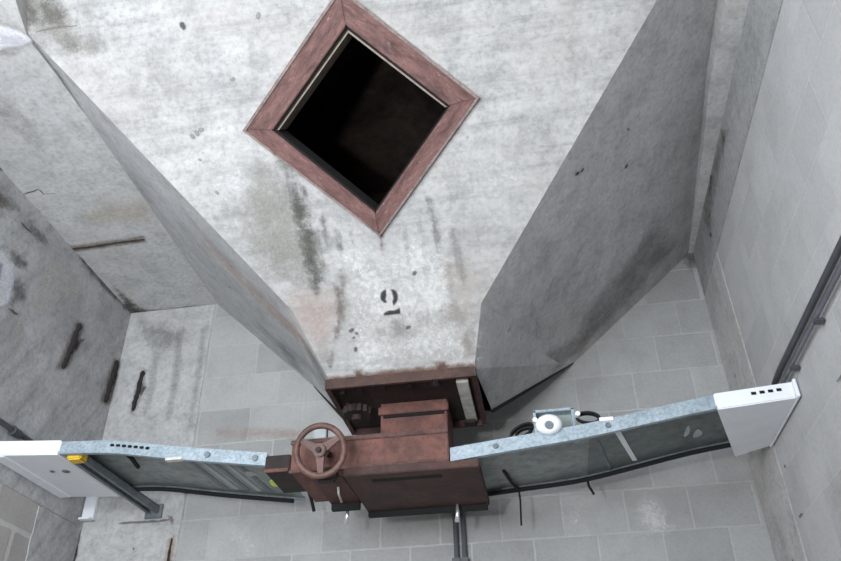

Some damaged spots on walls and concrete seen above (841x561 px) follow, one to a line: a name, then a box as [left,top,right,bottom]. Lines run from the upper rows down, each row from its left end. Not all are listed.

peeling [0,26,30,49]
water stain [250,171,322,294]
peeling [0,250,18,315]